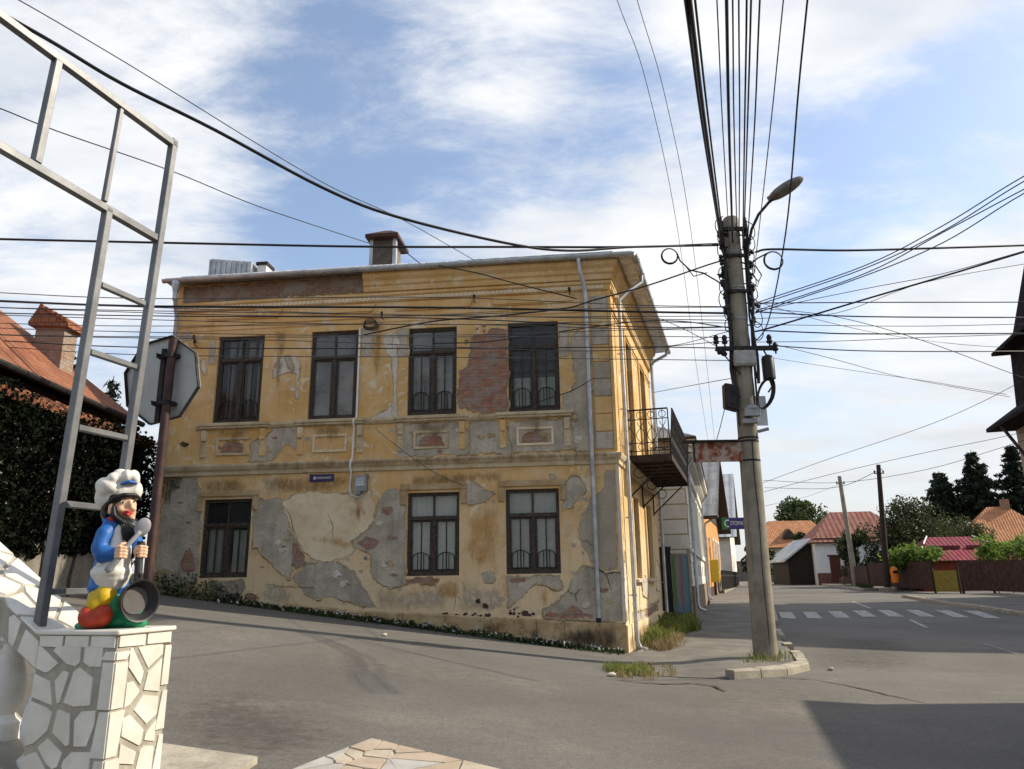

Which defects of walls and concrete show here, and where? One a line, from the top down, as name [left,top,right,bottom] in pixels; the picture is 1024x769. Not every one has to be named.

peeling [272,354,302,399]
spalling [361,324,596,458]
spalling [156,476,260,603]
peeling [252,487,440,609]
spalling [442,469,660,623]